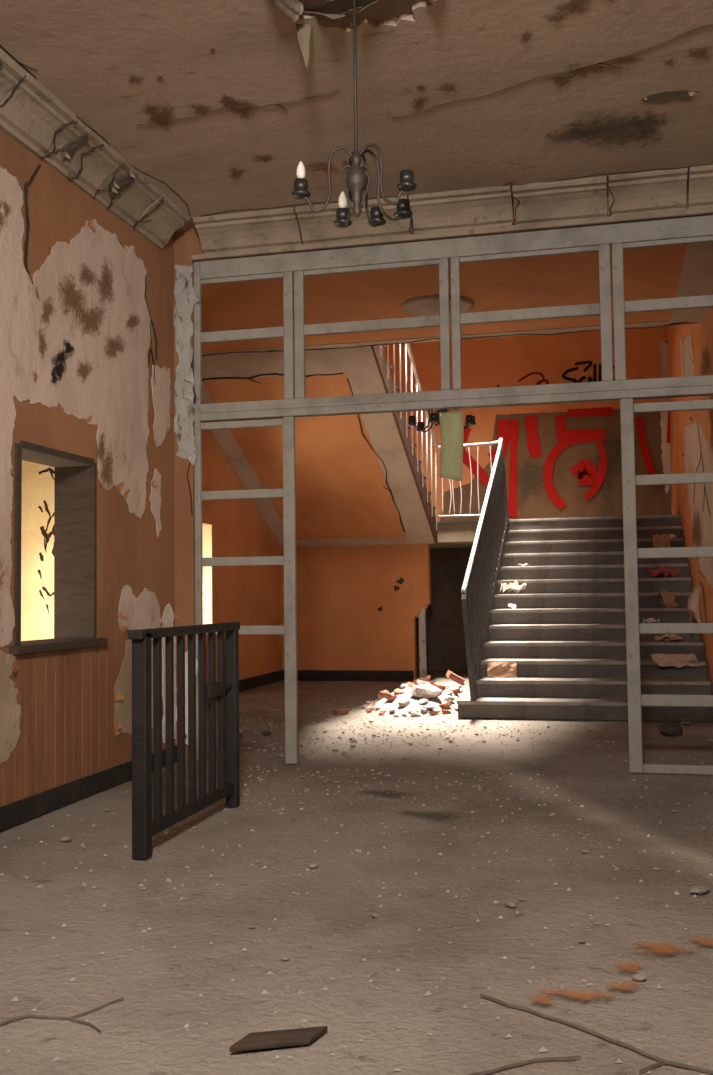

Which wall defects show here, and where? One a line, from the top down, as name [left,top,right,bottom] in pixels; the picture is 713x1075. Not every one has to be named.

damp [555,117,664,145]
damp [51,340,75,383]
peeling [0,167,698,648]
peeling [114,585,198,747]